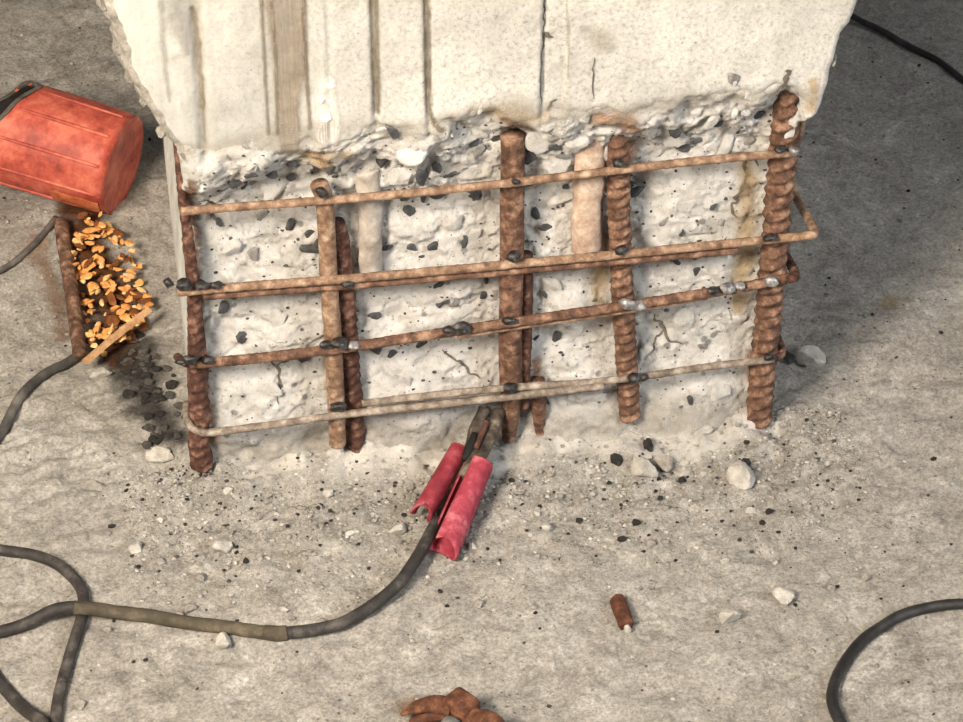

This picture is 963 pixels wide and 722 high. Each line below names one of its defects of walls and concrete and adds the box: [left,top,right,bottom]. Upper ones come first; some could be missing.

corrosion [485,110,535,130]
corrosion [186,181,200,279]
spalling [96,0,857,473]
corrosion [736,167,755,282]
crack [651,314,682,353]